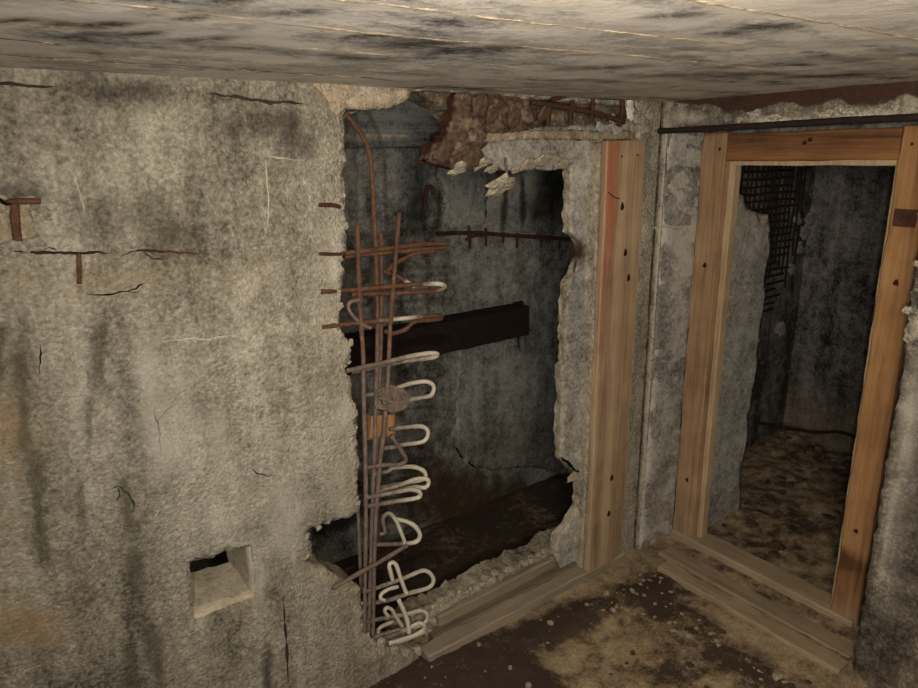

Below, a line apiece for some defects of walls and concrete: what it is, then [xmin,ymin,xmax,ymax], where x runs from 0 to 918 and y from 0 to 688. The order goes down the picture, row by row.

damp [46,22,159,38]
damp [708,23,802,35]
crack [0,38,423,89]
crack [211,93,305,105]
spalling [530,96,653,135]
spalling [0,195,53,259]
peeling [793,211,816,255]
crack [0,247,198,260]
crack [88,283,145,296]
spalling [902,260,918,346]
peeling [313,83,574,656]